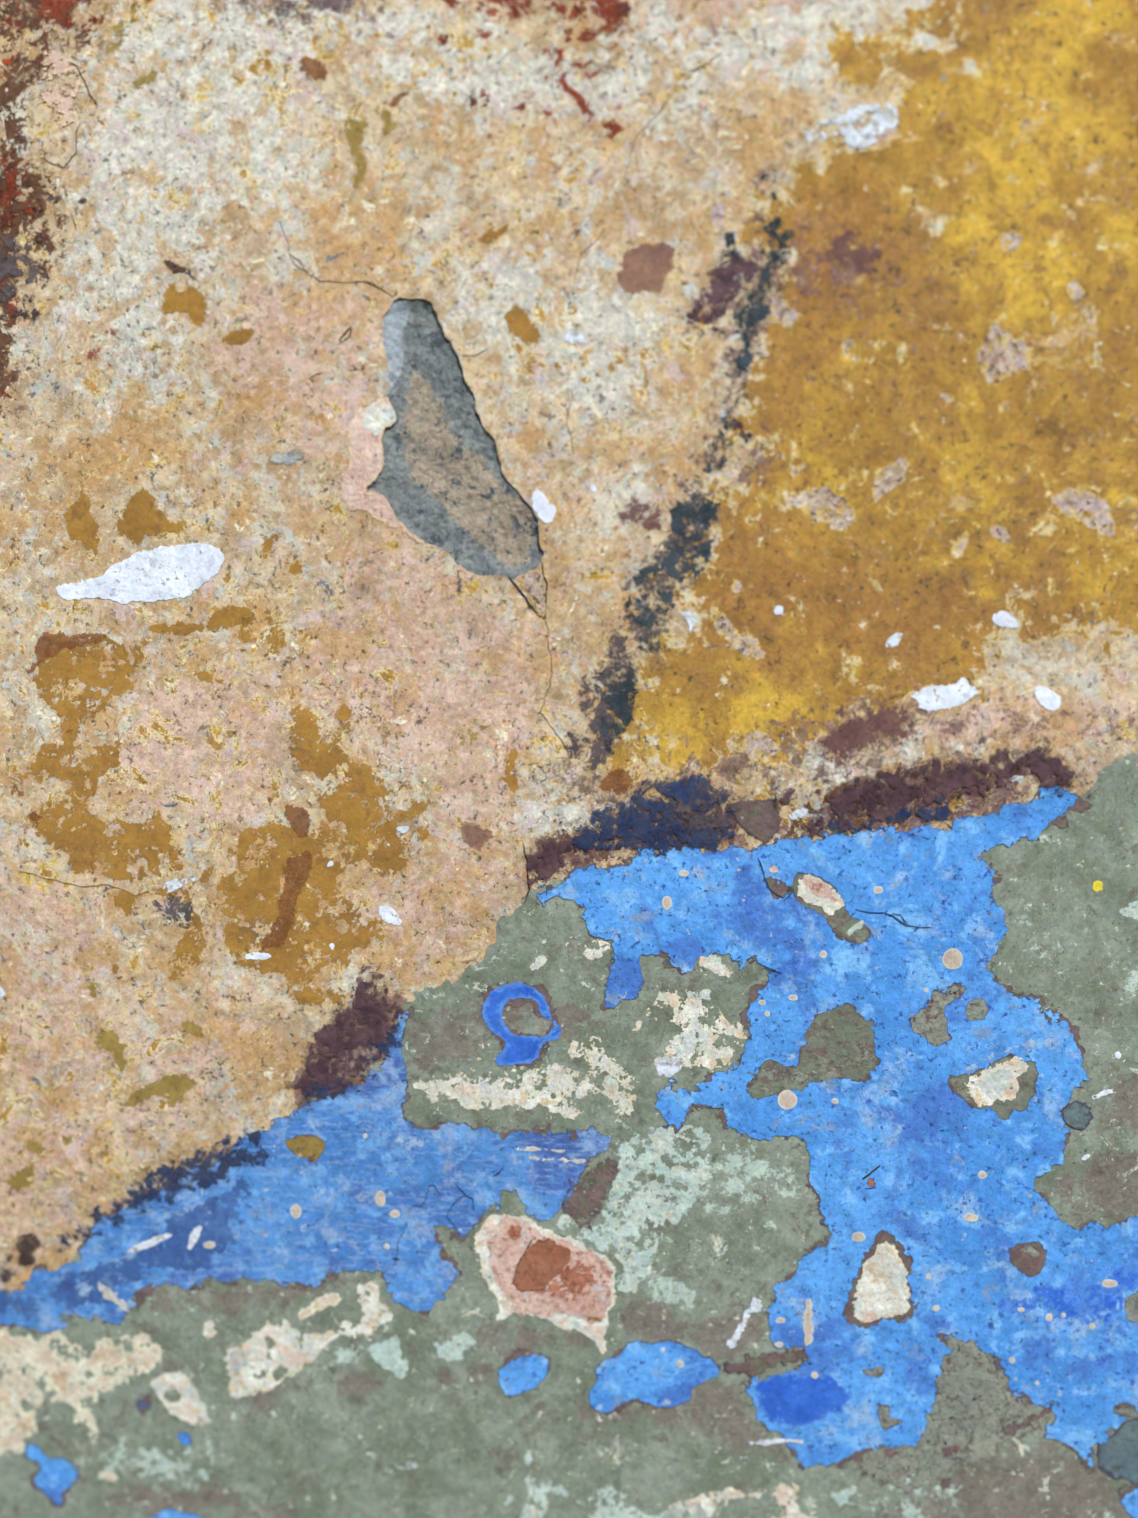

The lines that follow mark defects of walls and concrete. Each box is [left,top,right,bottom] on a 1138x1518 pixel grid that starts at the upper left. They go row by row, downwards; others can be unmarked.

peeling [0,8,21,67]
peeling [43,0,105,45]
peeling [540,0,632,56]
peeling [469,89,490,108]
peeling [0,50,105,245]
peeling [601,119,625,139]
flaking render [341,298,548,616]
peeling [0,785,1138,1518]